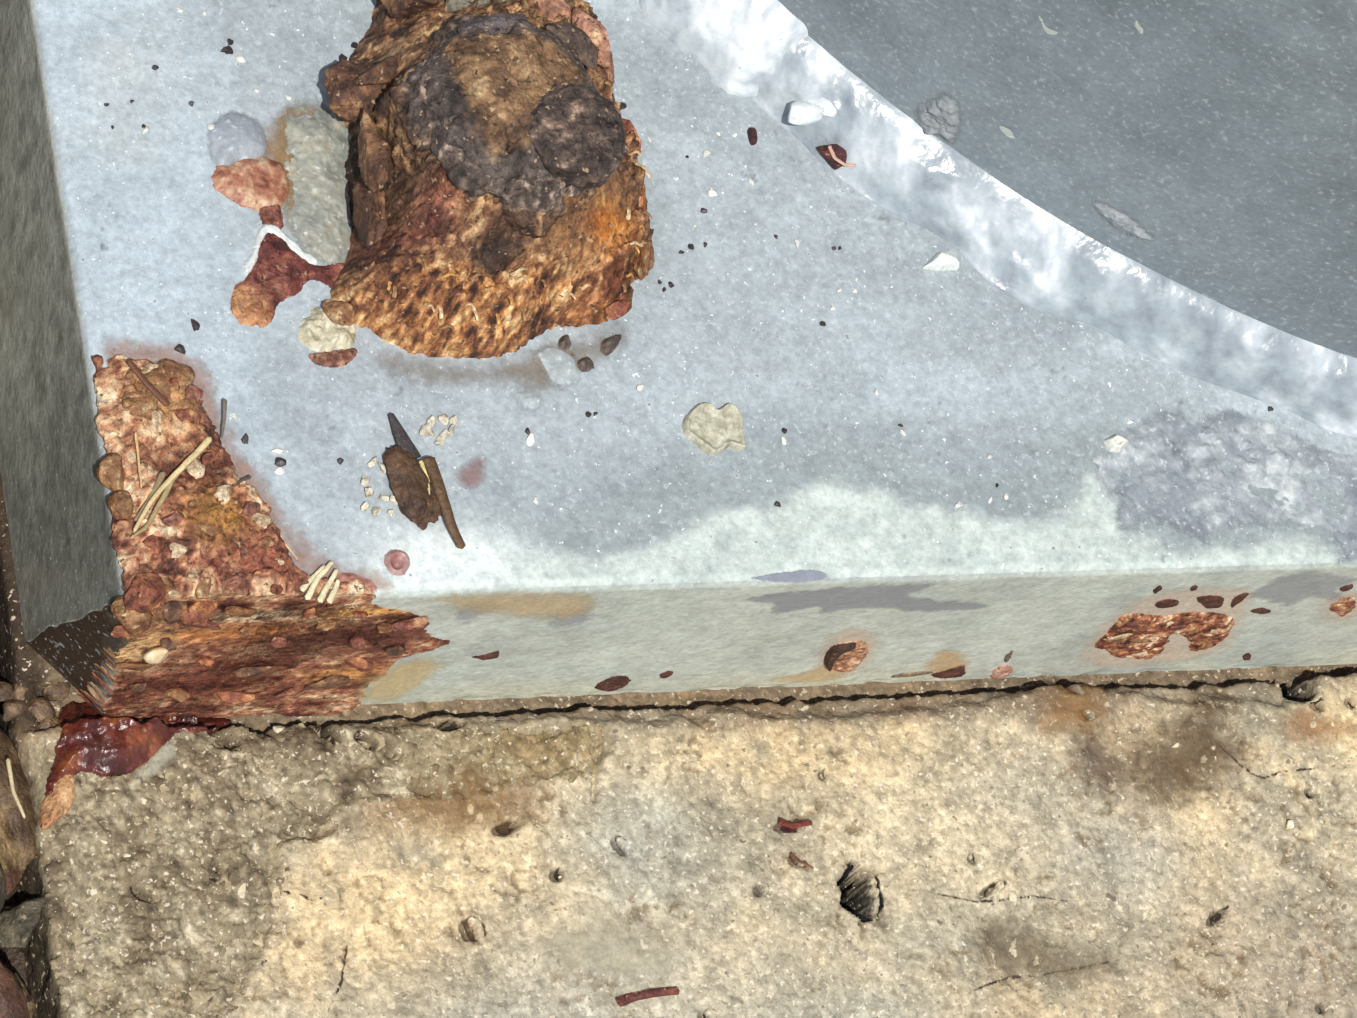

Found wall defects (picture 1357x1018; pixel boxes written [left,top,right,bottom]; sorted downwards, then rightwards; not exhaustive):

rust [381,0,615,83]
rust [323,55,399,250]
rust [230,122,355,328]
rust [509,267,546,295]
rust [557,118,655,372]
peeling [923,252,960,271]
rust [507,359,547,383]
rust [40,347,450,830]
rust [835,631,872,645]
rust [1094,585,1271,660]
rust [1329,584,1357,619]